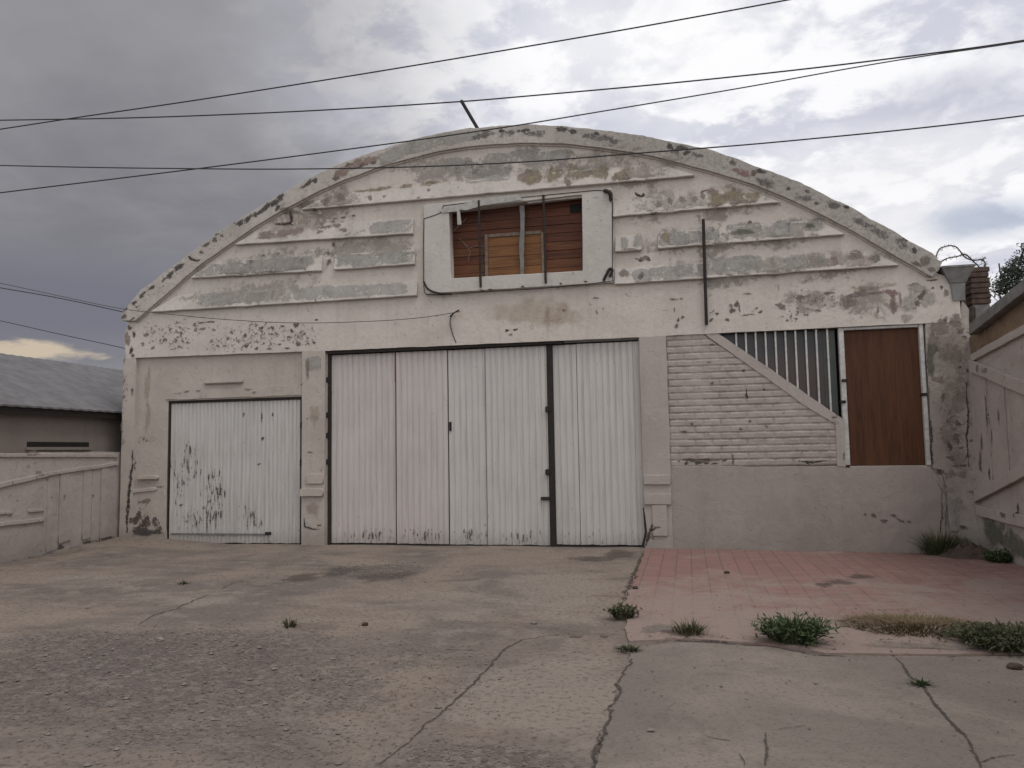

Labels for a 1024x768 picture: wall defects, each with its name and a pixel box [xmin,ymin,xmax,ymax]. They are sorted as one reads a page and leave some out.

peeling [332,129,479,181]
peeling [730,159,774,188]
peeling [280,181,438,214]
peeling [659,218,824,246]
peeling [196,233,312,278]
peeling [620,233,827,283]
spalling [909,256,948,307]
peeling [709,293,763,322]
peeling [776,290,885,322]
peeling [141,317,318,351]
damp [926,345,937,394]
damp [129,511,163,537]